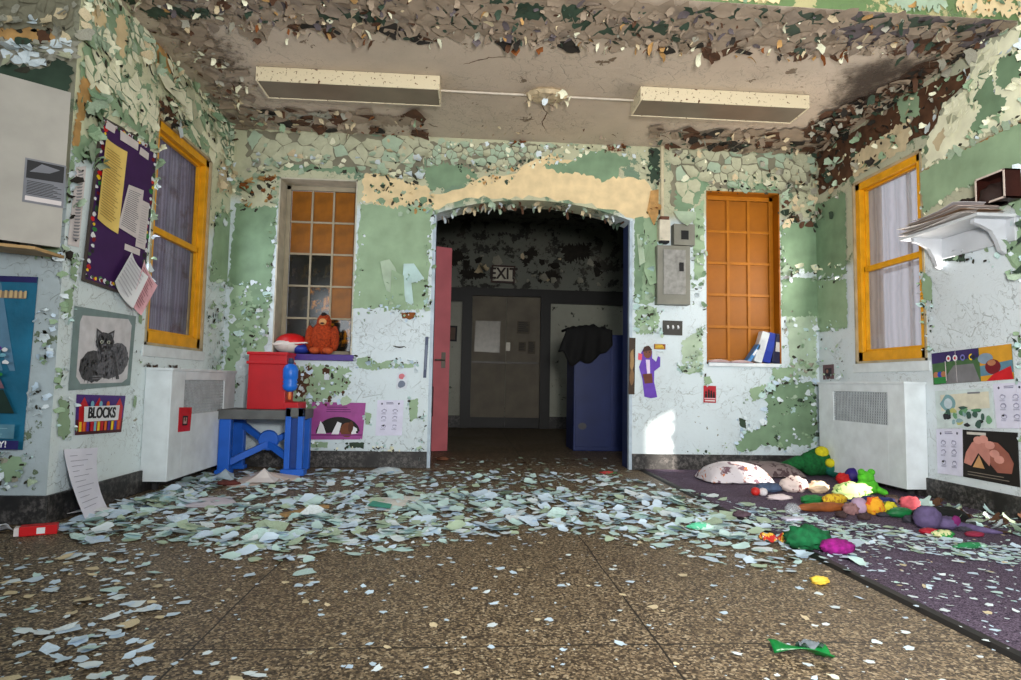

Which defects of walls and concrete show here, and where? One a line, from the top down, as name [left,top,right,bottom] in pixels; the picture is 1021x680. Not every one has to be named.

peeling [0,0,1021,459]